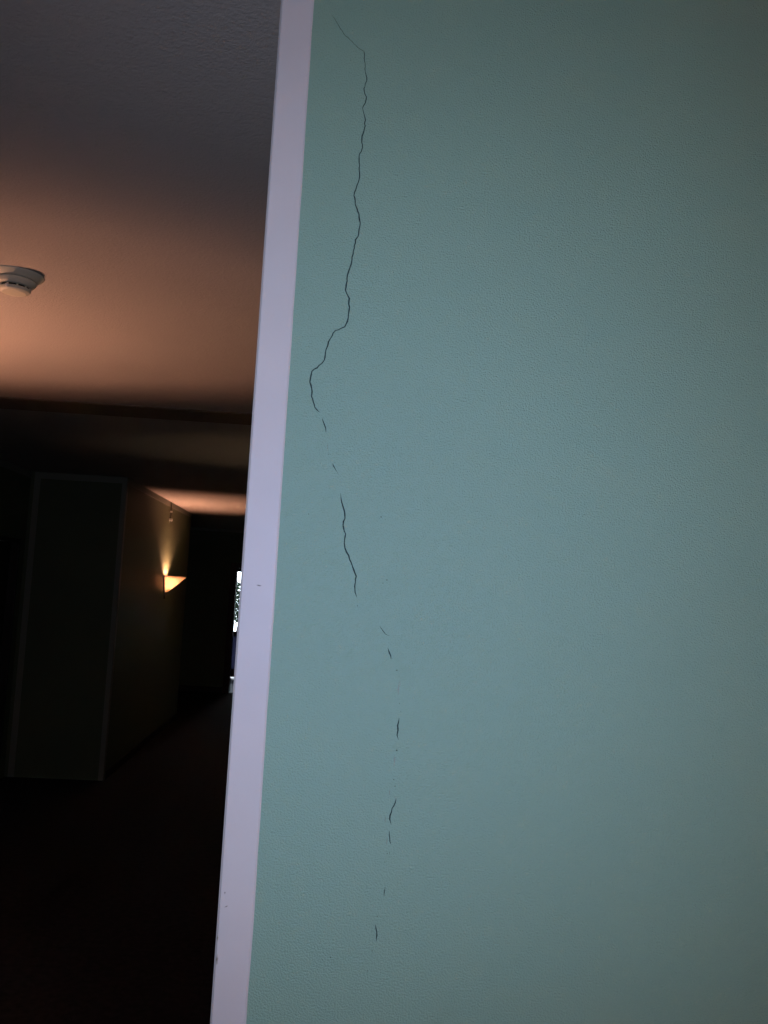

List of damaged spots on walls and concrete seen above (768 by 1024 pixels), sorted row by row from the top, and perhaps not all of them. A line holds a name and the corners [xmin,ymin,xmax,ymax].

crack [309,18,367,597]